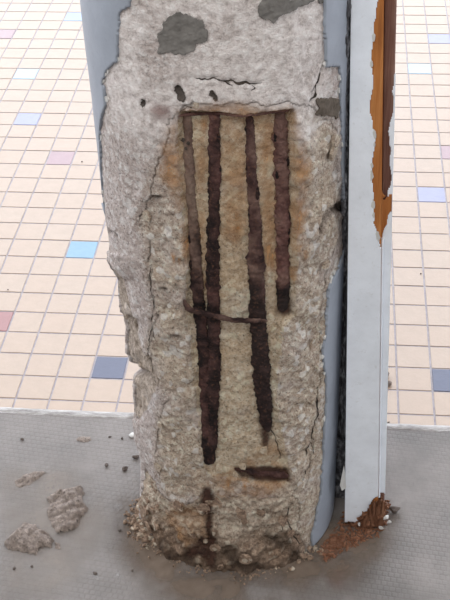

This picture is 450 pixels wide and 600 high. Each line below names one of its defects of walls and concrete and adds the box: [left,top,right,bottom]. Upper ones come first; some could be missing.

crack [196,77,262,91]
crack [147,267,156,372]
spalling [114,0,350,576]
crack [303,398,319,475]
corrosion [236,466,290,493]